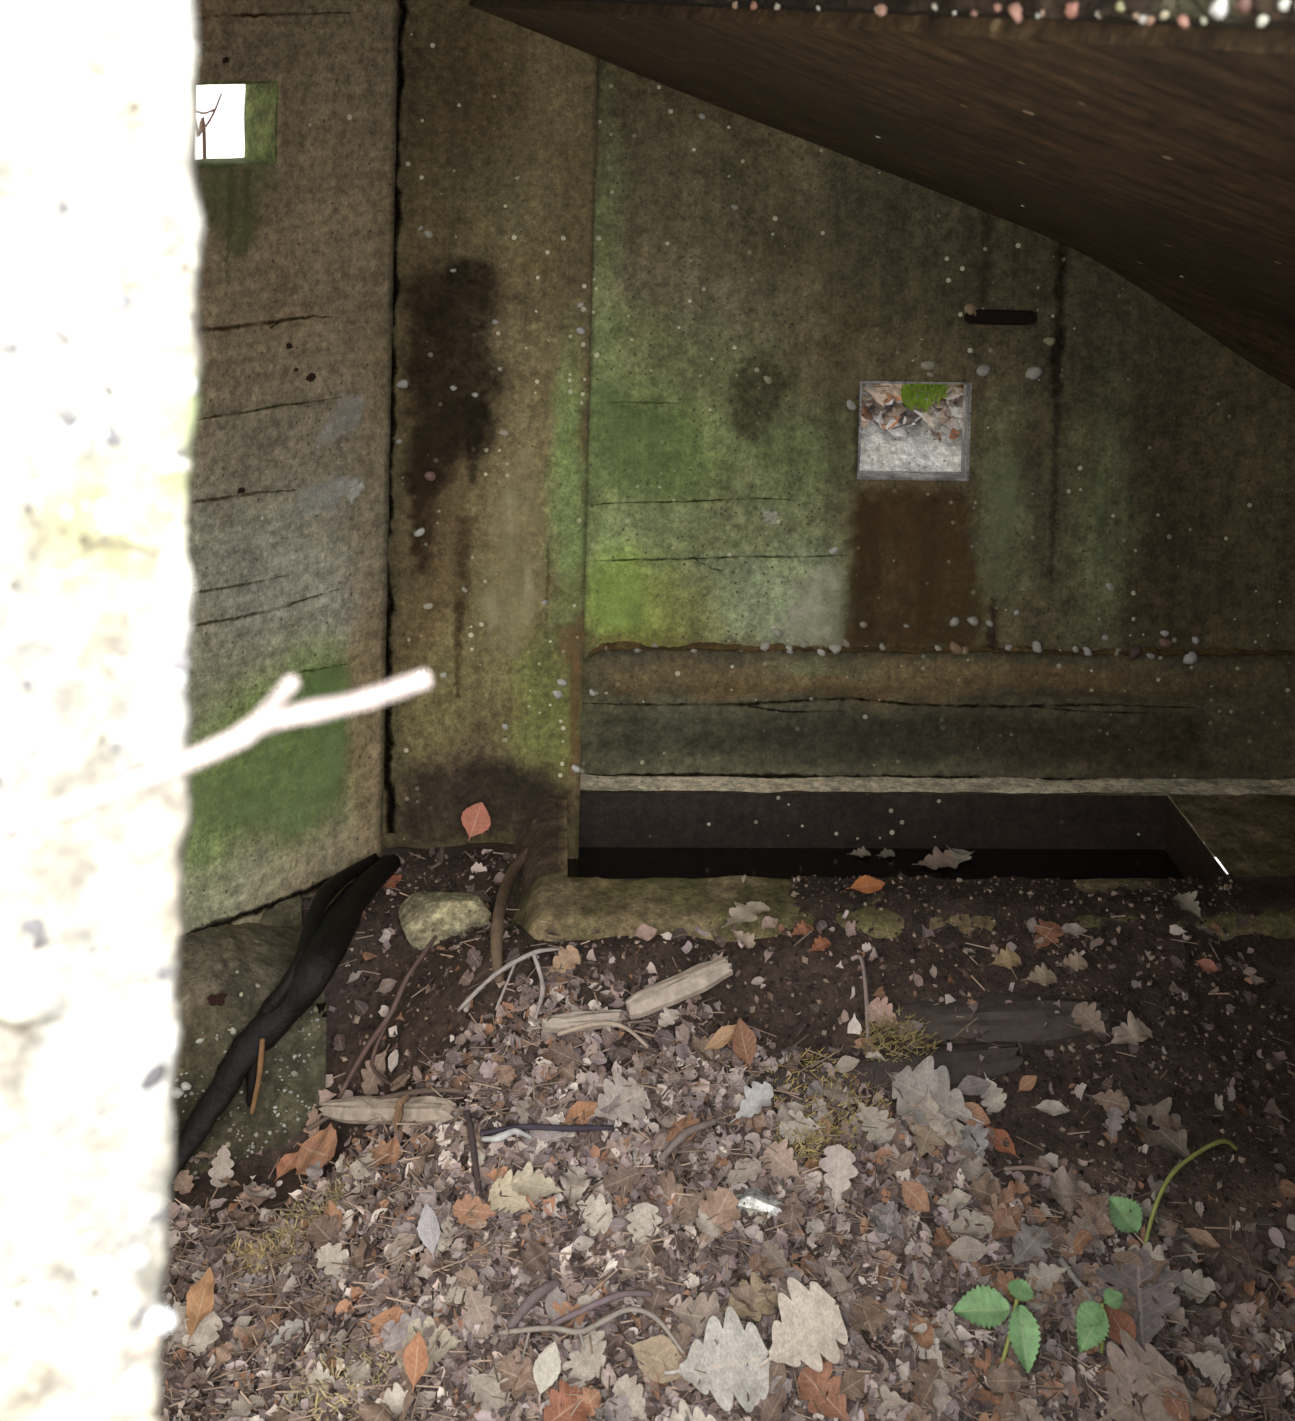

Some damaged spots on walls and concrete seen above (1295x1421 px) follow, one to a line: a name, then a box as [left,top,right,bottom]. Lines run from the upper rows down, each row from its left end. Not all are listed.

crack [232,11,274,19]
spalling [550,0,1295,31]
crack [202,315,329,331]
crack [199,396,343,420]
crack [383,0,408,833]
water stain [405,261,501,569]
crack [192,489,296,504]
crack [193,576,339,627]
crack [583,698,1194,714]
water stain [408,763,552,839]